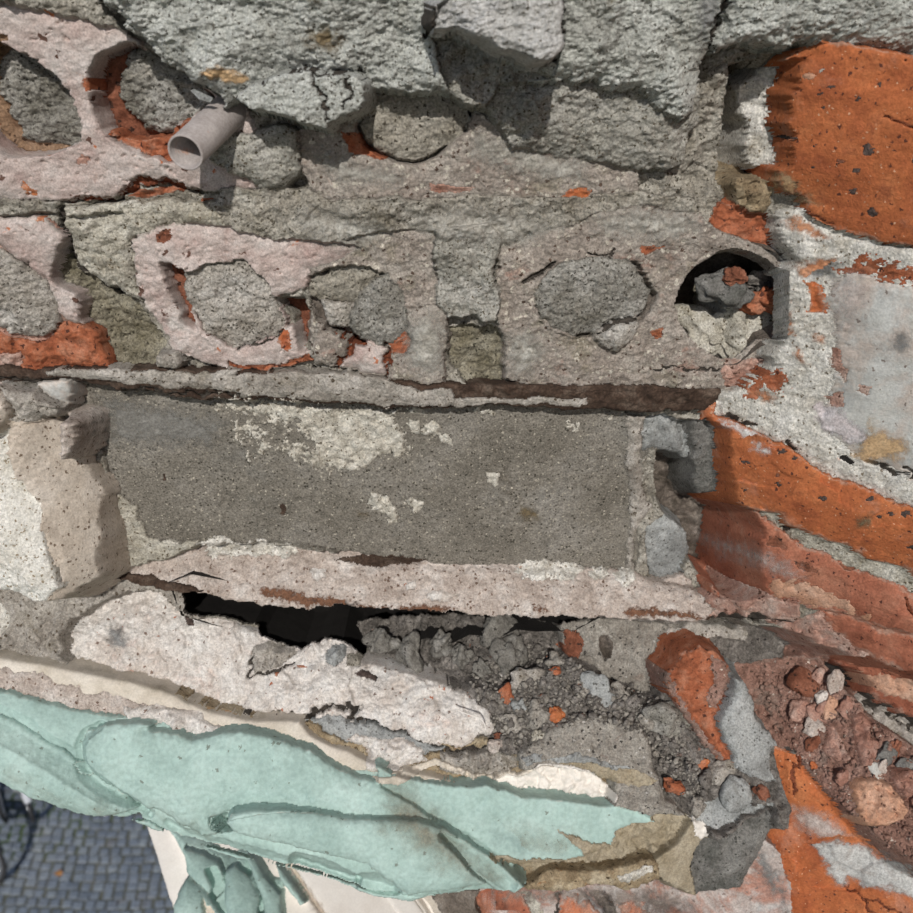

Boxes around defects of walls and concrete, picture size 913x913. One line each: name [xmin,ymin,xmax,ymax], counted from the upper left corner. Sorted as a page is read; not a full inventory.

crack [421,3,437,39]
crack [522,261,556,284]
crack [587,247,616,259]
spalling [831,252,913,287]
spalling [802,280,830,314]
crack [576,306,646,339]
spalling [0,320,118,370]
crack [653,364,721,372]
spalling [735,365,789,400]
spalling [168,571,490,654]
spalling [501,614,600,659]
peeling [373,709,709,895]